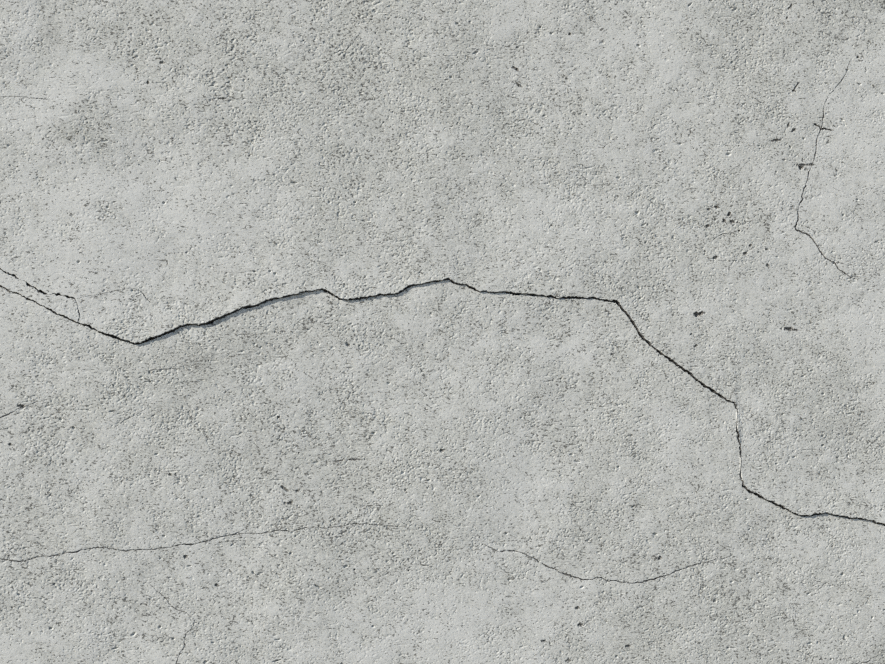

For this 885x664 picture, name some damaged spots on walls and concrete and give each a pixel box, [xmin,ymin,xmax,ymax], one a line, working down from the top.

crack [795,60,858,278]
crack [0,268,885,526]
crack [485,545,730,584]